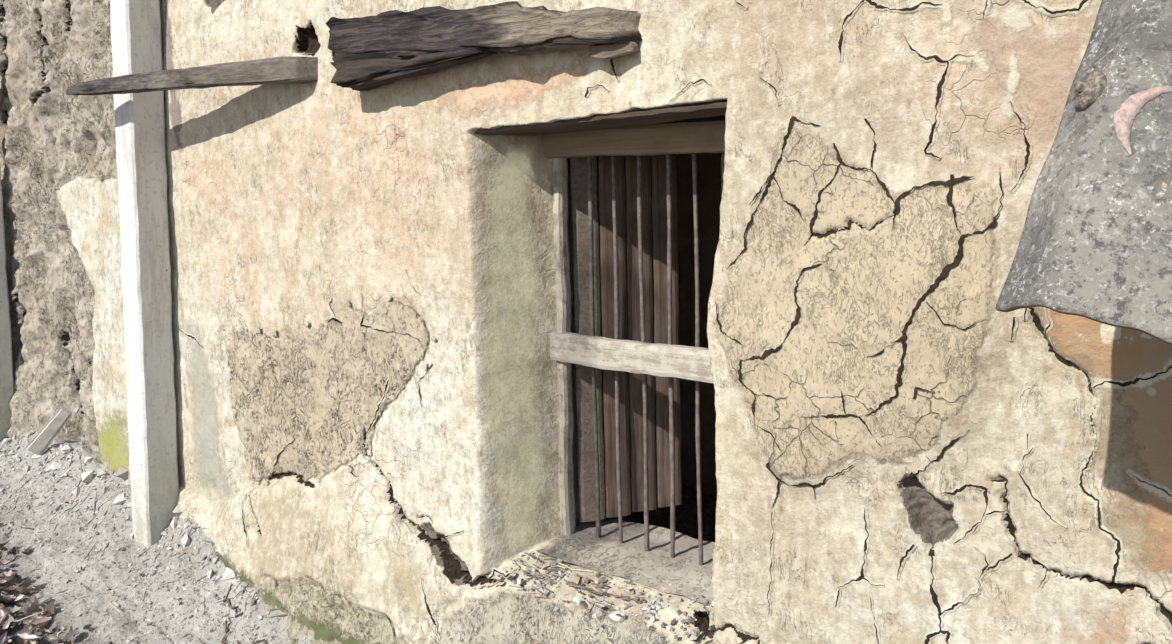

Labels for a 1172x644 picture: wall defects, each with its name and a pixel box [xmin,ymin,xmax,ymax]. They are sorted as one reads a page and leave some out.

spalling [295,23,321,56]
crack [584,58,620,98]
crack [669,76,711,104]
crack [690,0,1172,644]
crack [241,439,315,547]
spalling [224,295,436,487]
crack [327,293,520,641]
spalling [896,473,958,549]
peeling [1044,310,1172,573]
spalling [248,576,406,644]
spalling [420,522,677,644]
spalling [693,611,710,632]